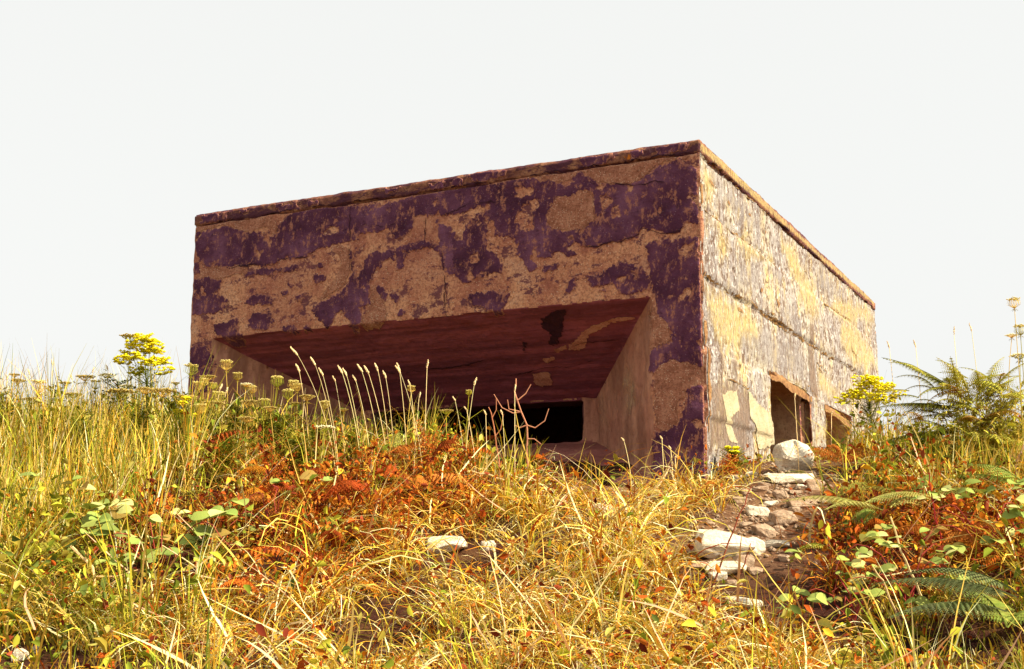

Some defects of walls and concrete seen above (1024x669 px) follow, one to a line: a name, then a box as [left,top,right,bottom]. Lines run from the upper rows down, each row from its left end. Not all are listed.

peeling [189,142,775,482]
water stain [541,310,566,346]